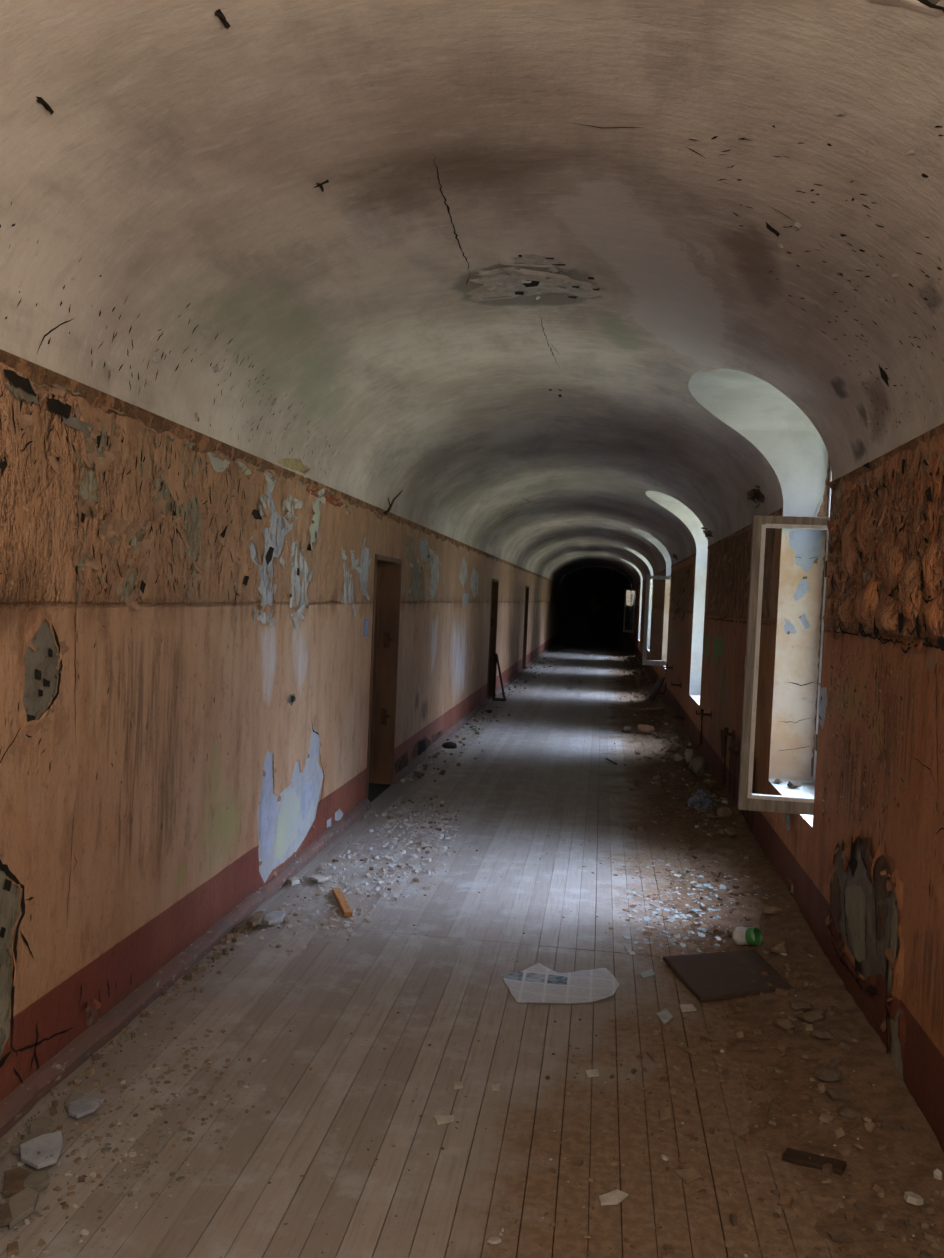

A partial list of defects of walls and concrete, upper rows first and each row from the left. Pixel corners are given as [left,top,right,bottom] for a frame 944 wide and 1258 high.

flaking render [867,0,944,18]
crack [433,155,470,285]
peeling [766,221,942,441]
flaking render [0,295,547,629]
flaking render [5,608,69,770]
peeling [254,715,344,888]
flaking render [0,850,36,1068]
flaking render [825,826,906,1081]